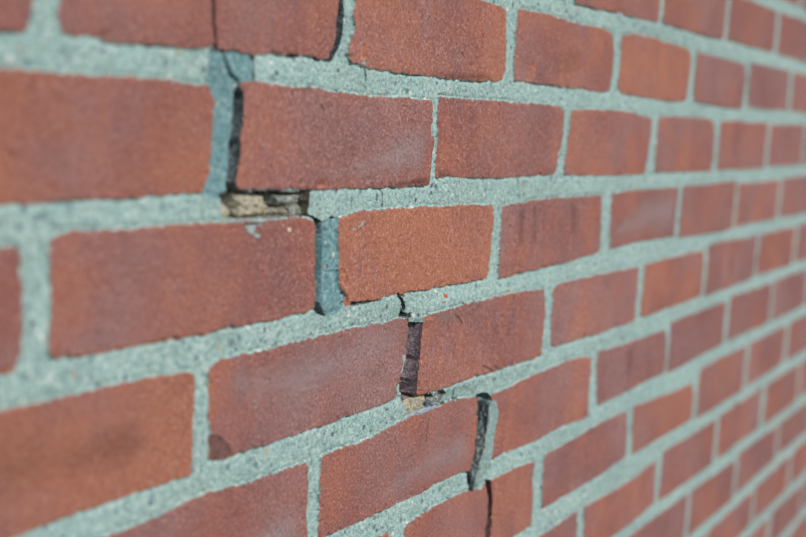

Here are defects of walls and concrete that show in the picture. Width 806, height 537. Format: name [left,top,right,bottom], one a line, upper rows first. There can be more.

crack [211,0,225,52]
crack [225,56,257,190]
spalling [217,180,326,238]
crack [301,214,334,222]
crack [350,293,492,442]
crack [468,479,493,537]